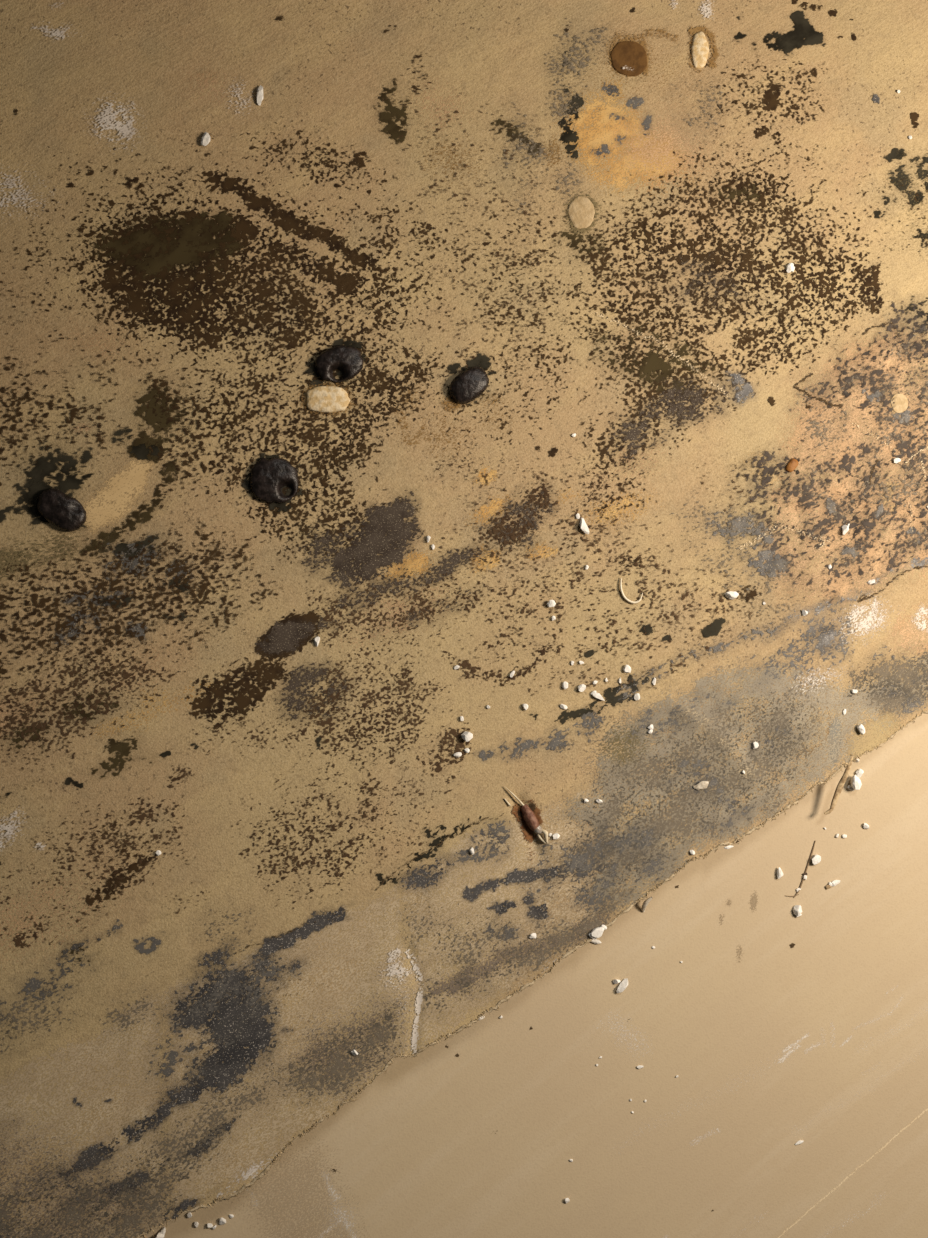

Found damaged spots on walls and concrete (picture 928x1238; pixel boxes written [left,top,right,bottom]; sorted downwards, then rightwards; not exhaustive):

damp [752,0,826,60]
damp [233,122,390,201]
damp [865,148,928,256]
damp [142,751,194,788]
damp [0,795,188,1053]
peeling [0,777,607,1238]
damp [0,904,416,1238]